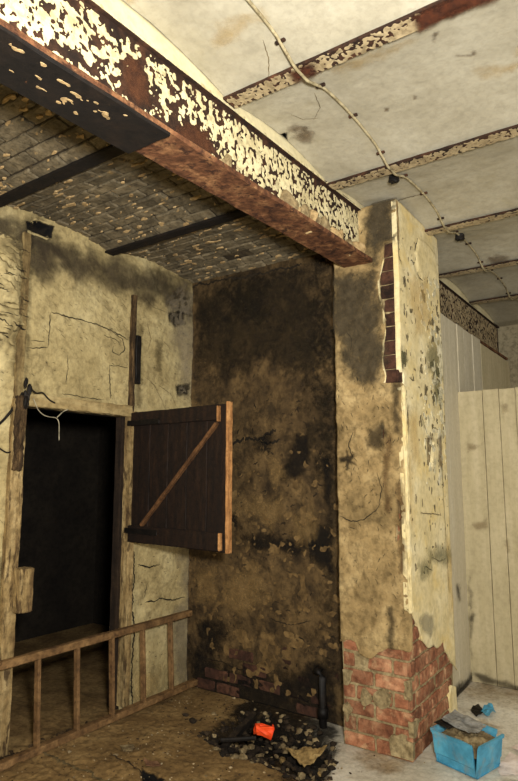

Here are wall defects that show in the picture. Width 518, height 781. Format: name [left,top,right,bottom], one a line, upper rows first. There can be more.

rust [414,0,493,32]
rust [290,65,317,83]
rust [179,127,208,147]
water stain [192,262,353,581]
spalling [372,238,518,541]
water stain [187,615,339,725]
spalling [196,490,457,763]